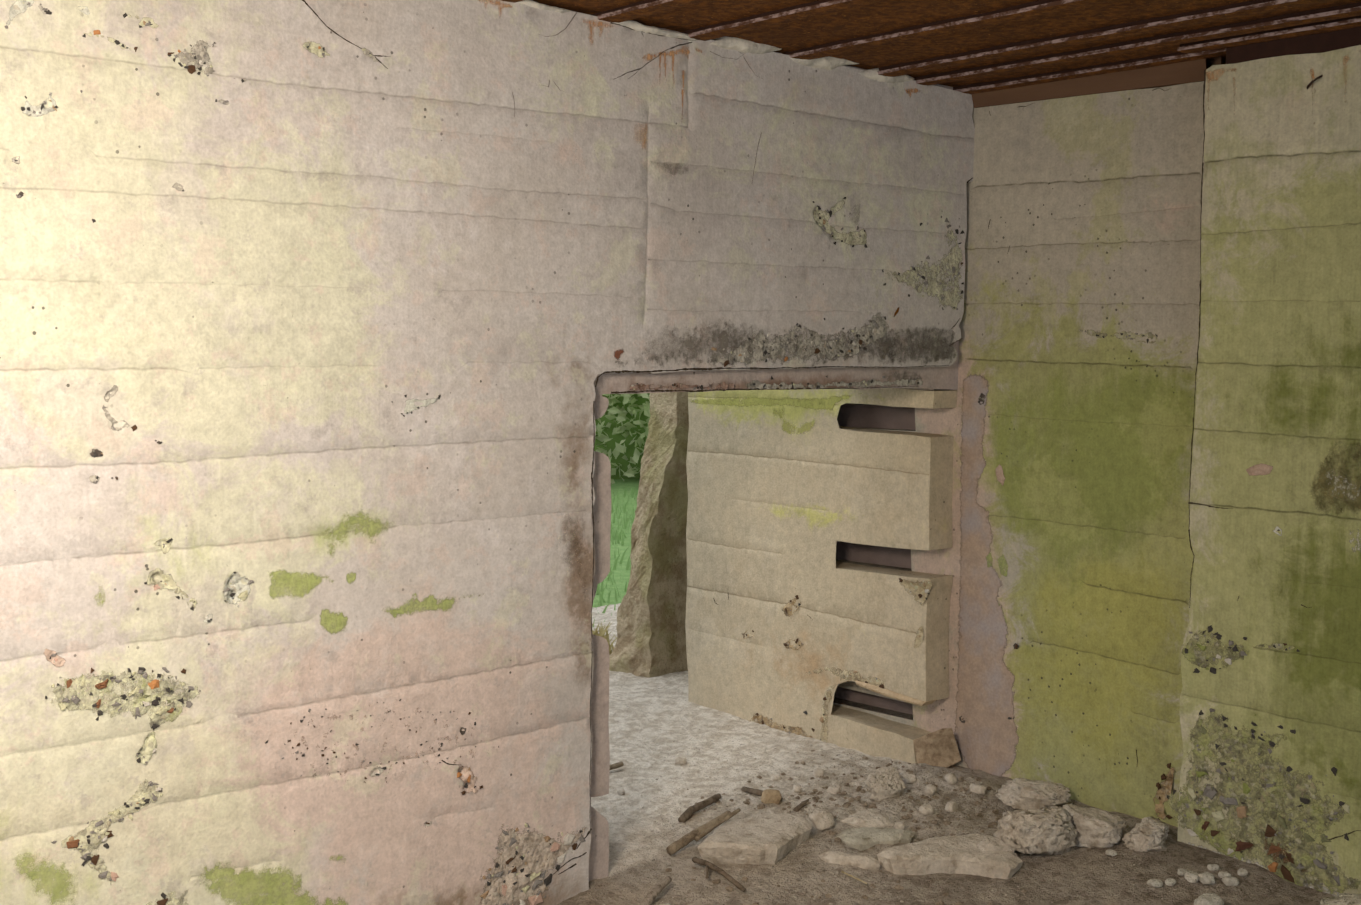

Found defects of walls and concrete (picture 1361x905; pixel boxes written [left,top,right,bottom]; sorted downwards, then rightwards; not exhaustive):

crack [302,0,389,69]
spalling [882,218,964,310]
damp [652,323,752,365]
damp [782,328,956,380]
damp [1312,443,1361,514]
spalling [136,731,157,765]